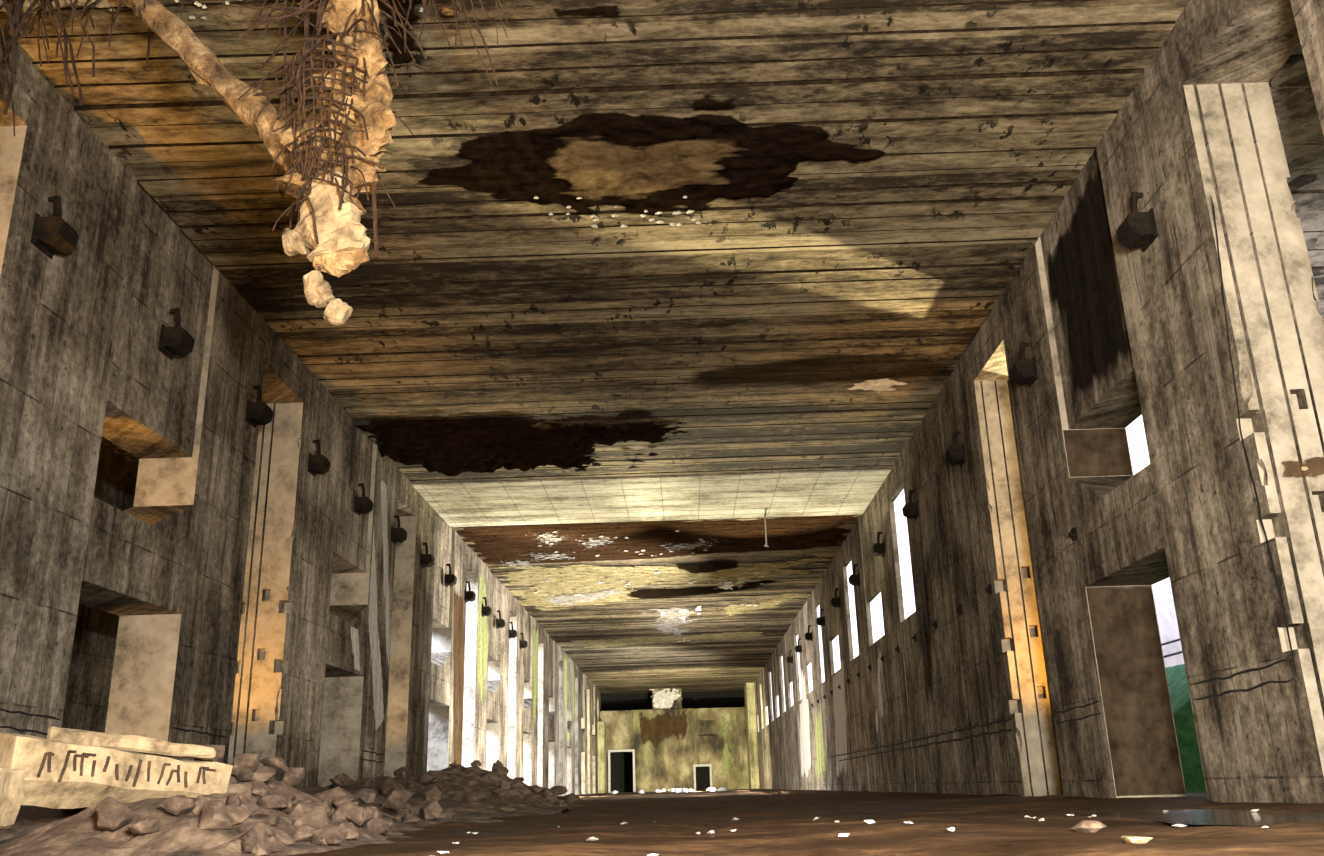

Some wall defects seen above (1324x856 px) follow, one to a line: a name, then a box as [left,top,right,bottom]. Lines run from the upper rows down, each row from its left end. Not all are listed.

spalling [0,0,124,14]
spalling [418,94,886,228]